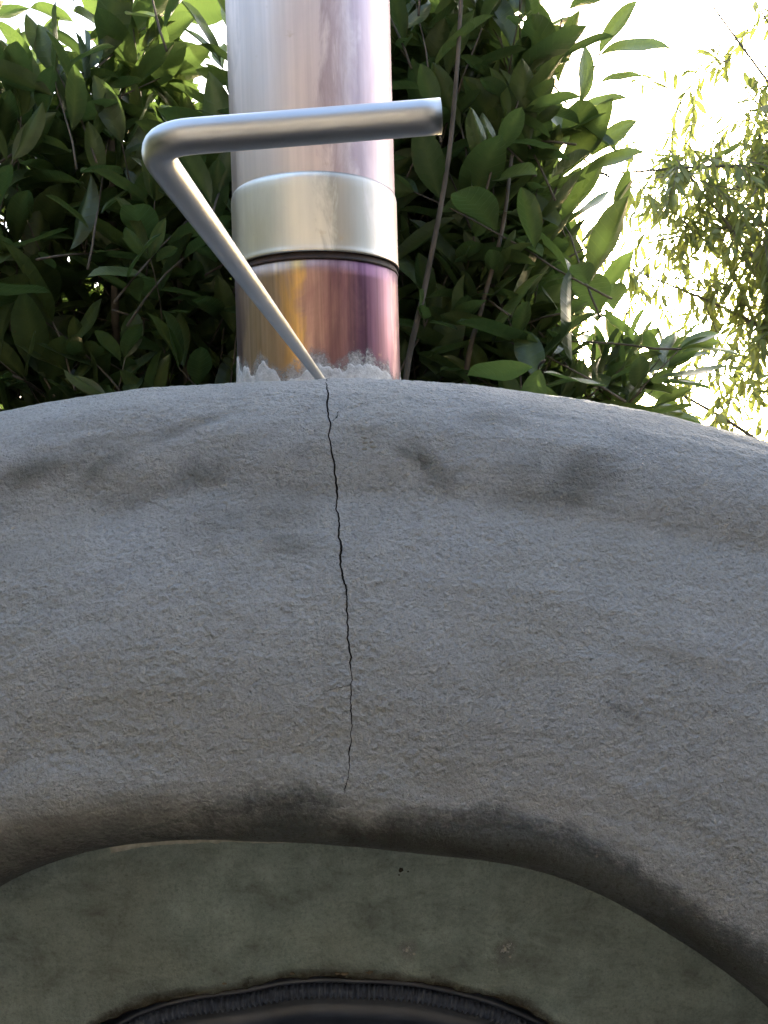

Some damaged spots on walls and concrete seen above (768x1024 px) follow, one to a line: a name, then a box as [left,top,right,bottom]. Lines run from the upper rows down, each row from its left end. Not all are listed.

crack [325,378,353,791]